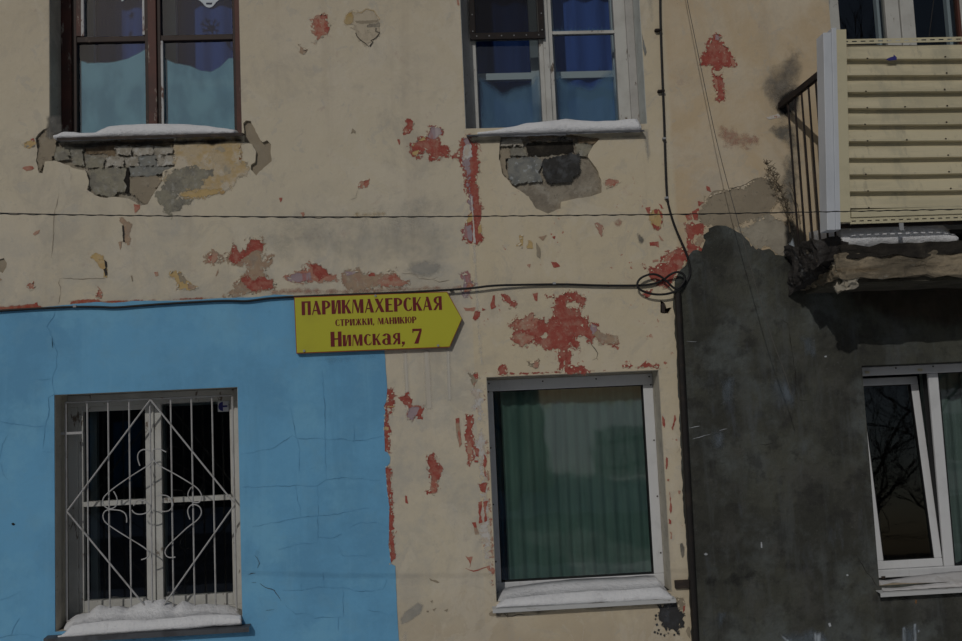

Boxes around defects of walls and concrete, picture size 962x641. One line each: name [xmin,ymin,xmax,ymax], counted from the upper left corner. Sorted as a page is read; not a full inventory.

peeling [297,12,331,55]
peeling [699,32,738,103]
flaking render [22,128,187,250]
flaking render [193,121,272,200]
peeling [397,119,484,246]
flaking render [499,134,621,213]
peeling [203,236,410,298]
spalling [807,251,859,294]
peeling [458,271,620,376]
peeling [383,388,425,453]
peeling [426,452,444,496]
peeling [385,466,408,565]